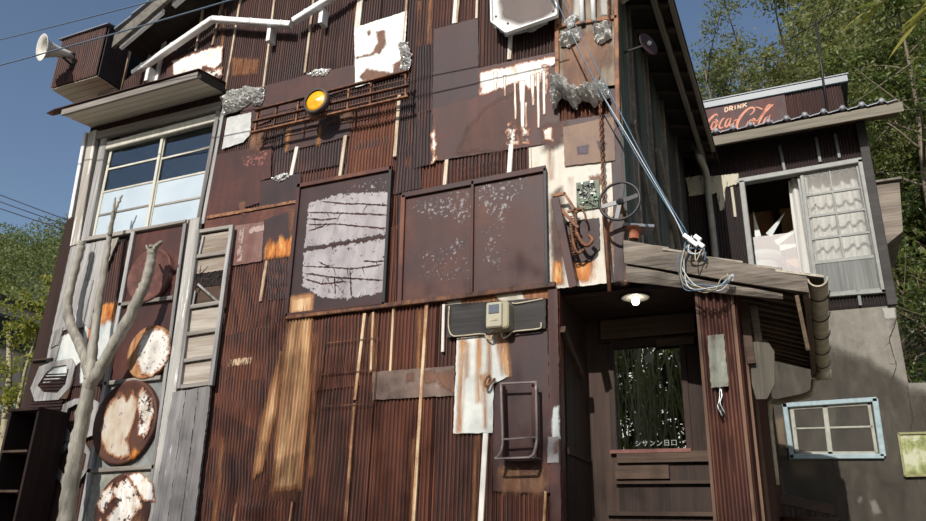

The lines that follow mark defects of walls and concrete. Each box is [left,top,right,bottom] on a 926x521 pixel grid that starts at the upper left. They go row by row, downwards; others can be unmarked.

peeling [478,56,555,96]
peeling [505,123,531,146]
corrosion [264,236,292,259]
peeling [302,178,388,300]
corrosion [550,188,592,284]
peeling [136,328,171,377]
corrosion [253,293,314,492]
corrosion [407,334,509,432]
peeling [99,386,154,460]
peeling [96,472,156,521]
corrosion [498,465,545,494]